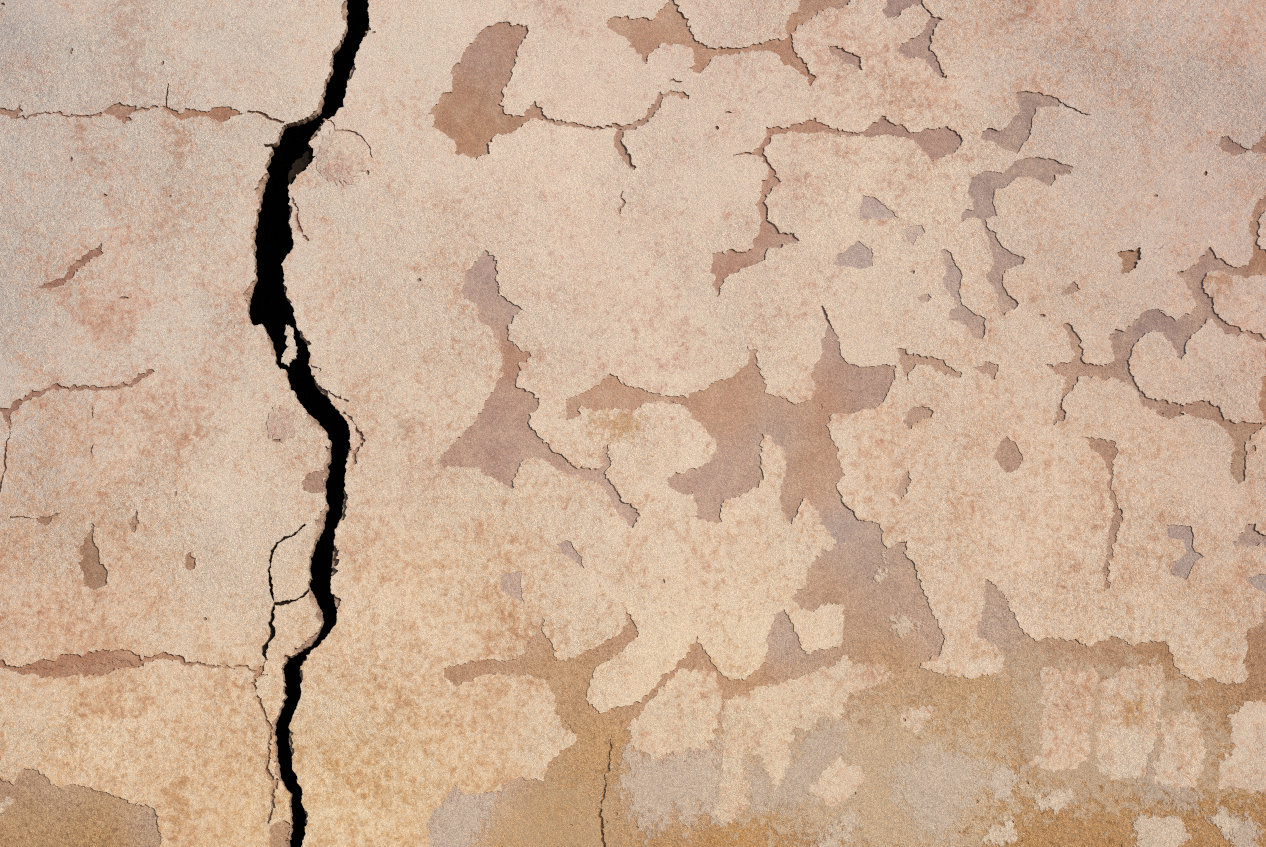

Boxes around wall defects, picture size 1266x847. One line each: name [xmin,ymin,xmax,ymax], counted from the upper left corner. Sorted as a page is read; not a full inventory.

crack [0,0,373,847]
flaking render [439,250,640,528]
flaking render [428,21,690,170]
flaking render [606,0,850,86]
flaking render [710,115,963,297]
peeling [828,46,863,70]
flaking render [882,0,947,78]
peeling [940,249,986,339]
flaking render [960,91,1090,315]
flaking render [1045,195,1266,484]
peeling [1216,132,1266,156]
flaking render [425,306,1266,847]